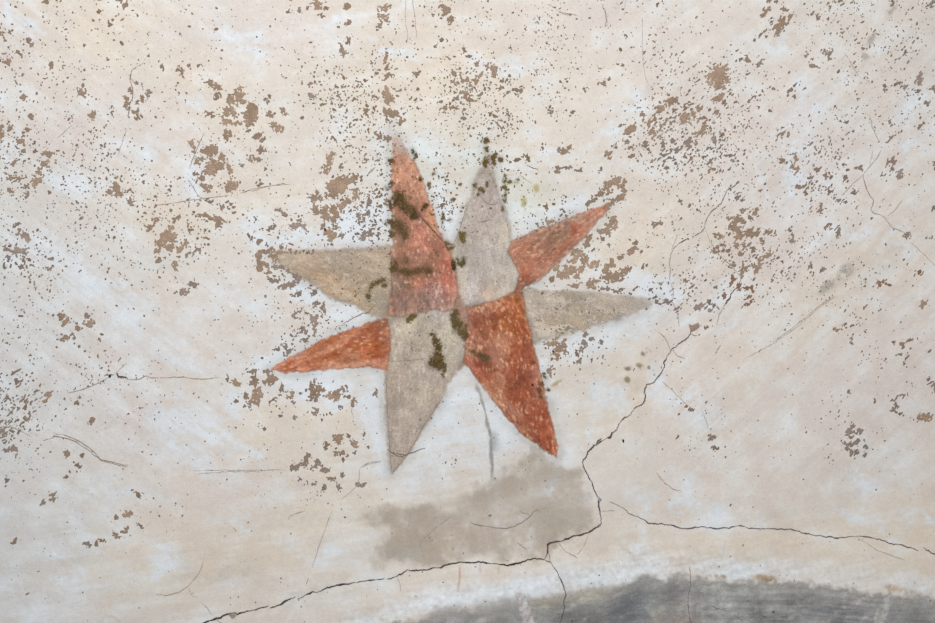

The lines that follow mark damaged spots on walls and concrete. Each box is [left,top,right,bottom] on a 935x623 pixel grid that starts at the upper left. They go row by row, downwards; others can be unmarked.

peeling [858,315,934,377]
crack [67,365,216,393]
crack [158,183,935,623]
peeling [820,380,896,465]
peeling [888,381,934,422]